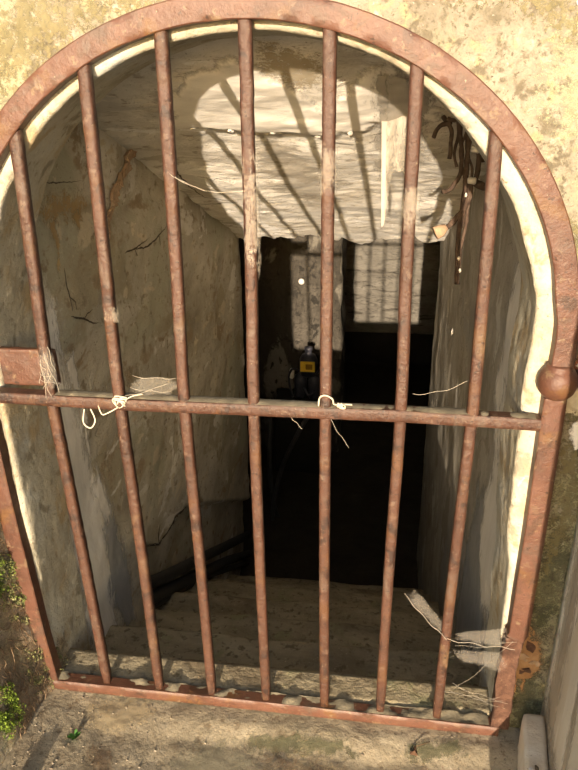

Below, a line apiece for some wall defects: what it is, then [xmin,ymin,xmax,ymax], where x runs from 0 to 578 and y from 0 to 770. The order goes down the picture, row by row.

crack [126,227,166,256]
crack [64,268,100,324]
rust [512,626,543,700]